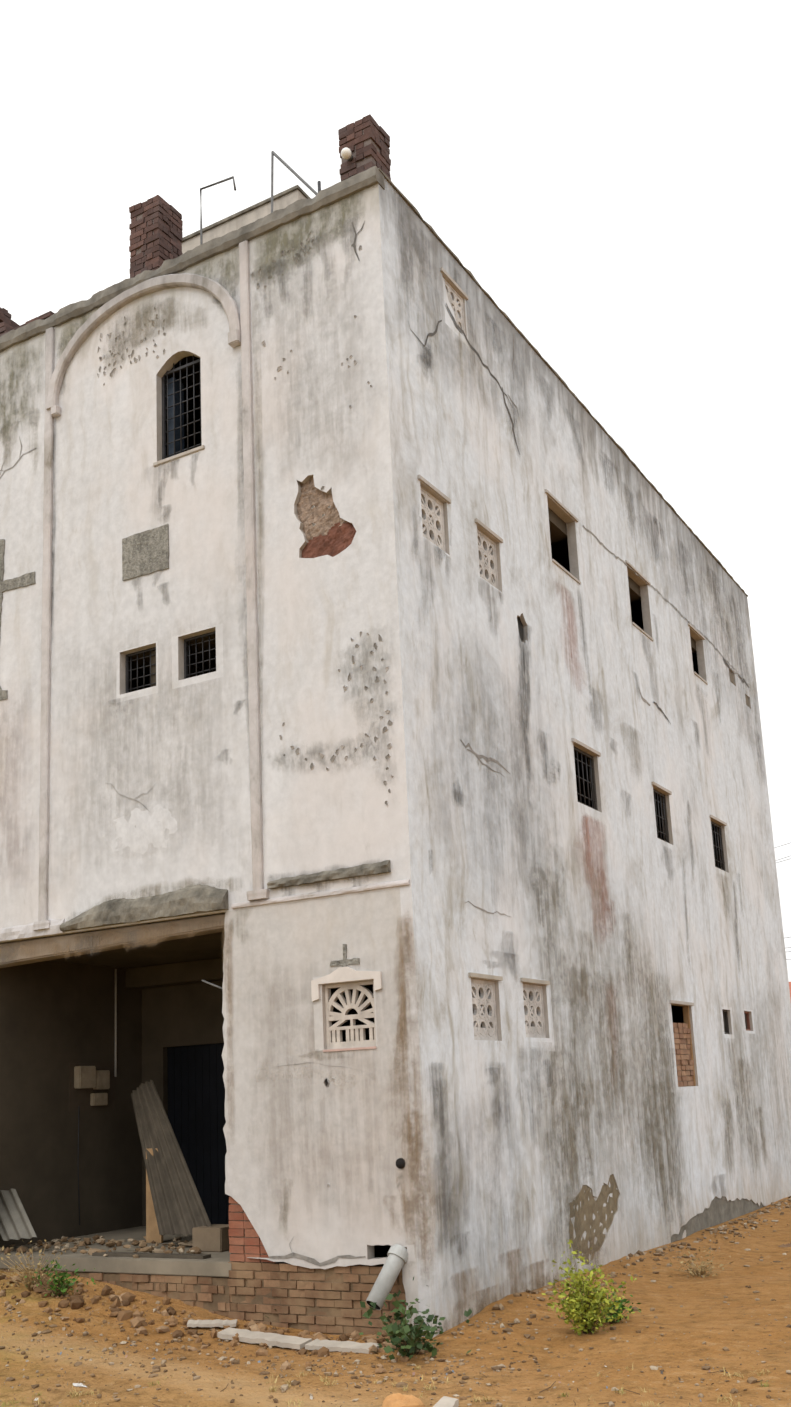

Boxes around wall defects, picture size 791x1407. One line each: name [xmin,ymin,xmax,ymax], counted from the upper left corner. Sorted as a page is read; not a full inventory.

water stain [0,355,28,431]
crack [408,303,520,454]
crack [0,437,36,478]
flaking render [297,477,356,558]
water stain [517,617,526,686]
water stain [399,933,411,1046]
flaking render [228,1196,276,1263]
flaking render [569,1174,619,1268]
flaking render [671,1196,764,1243]